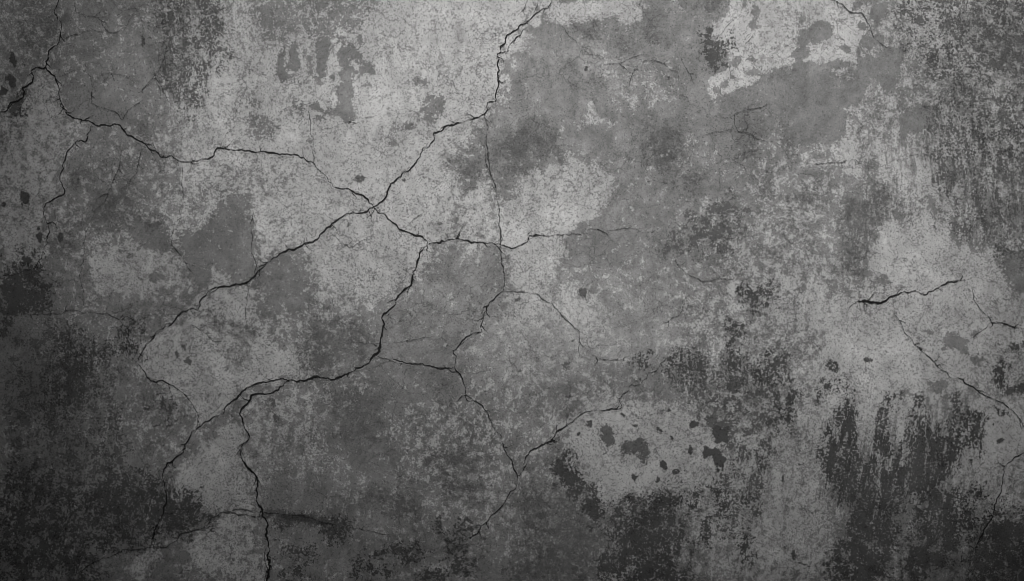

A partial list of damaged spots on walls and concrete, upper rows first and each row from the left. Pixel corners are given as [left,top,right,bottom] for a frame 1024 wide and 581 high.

crack [1,0,736,581]
crack [848,274,1024,426]
crack [974,453,1023,548]